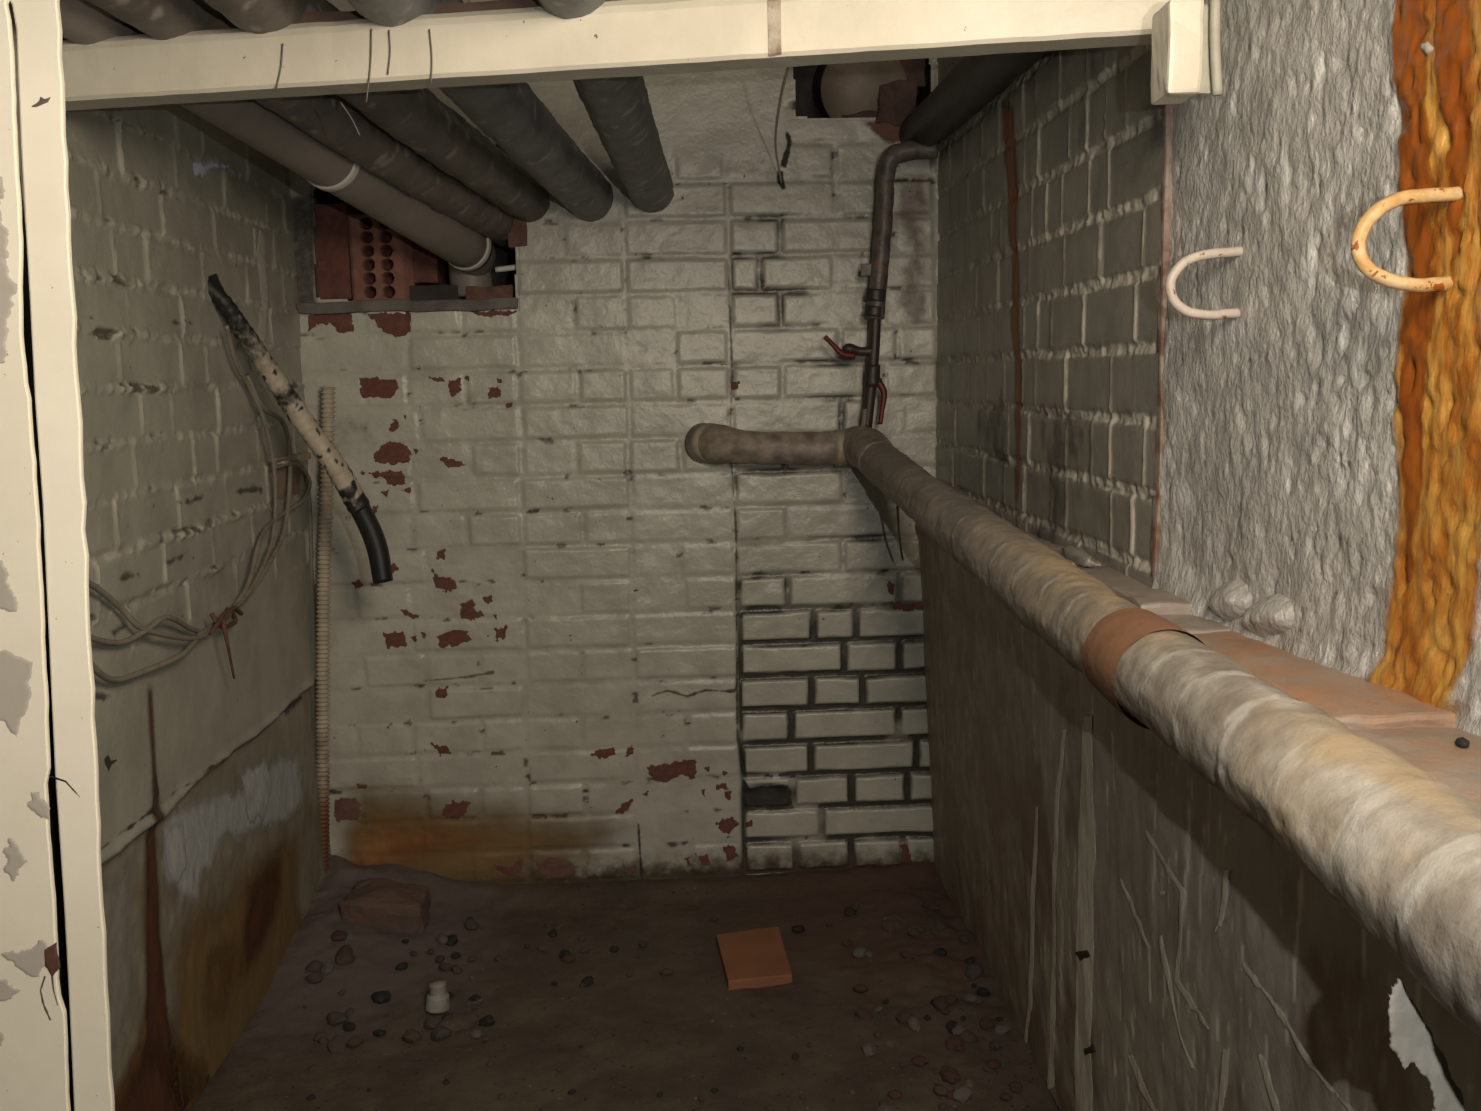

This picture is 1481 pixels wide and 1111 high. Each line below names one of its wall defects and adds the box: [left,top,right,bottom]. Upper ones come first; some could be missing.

peeling [0,176,18,363]
peeling [308,312,411,337]
peeling [359,377,399,399]
rust [1369,0,1481,713]
peeling [360,415,418,513]
peeling [0,560,18,612]
peeling [383,549,508,649]
peeling [0,650,33,736]
peeling [27,792,50,819]
efflorescence [163,756,301,900]
rust [114,692,301,1111]
peeling [0,940,48,1001]